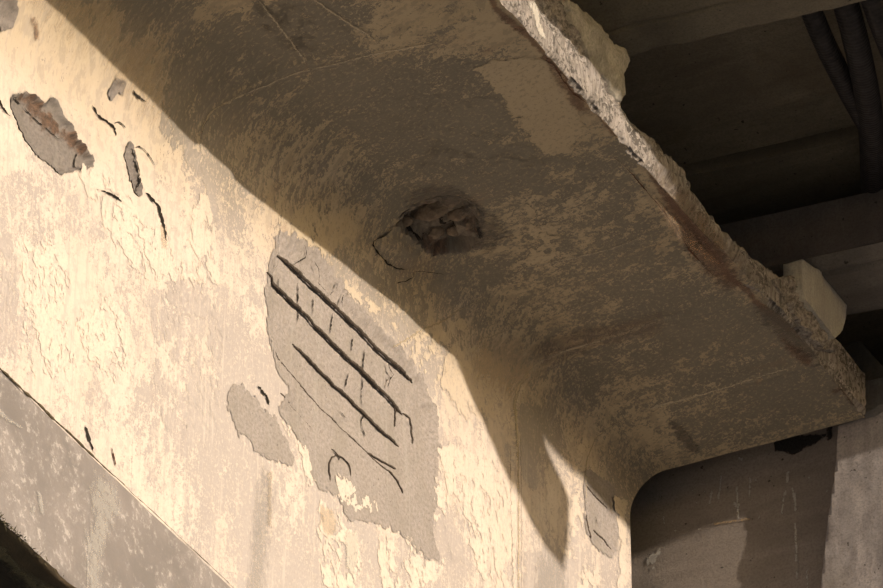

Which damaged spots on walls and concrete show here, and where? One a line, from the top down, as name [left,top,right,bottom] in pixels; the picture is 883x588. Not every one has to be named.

spalling [0,0,19,31]
peeling [472,50,590,156]
rust [490,0,621,143]
spalling [531,0,630,117]
crack [146,193,167,241]
spalling [10,91,630,588]
rust [649,173,813,364]
spalling [771,259,847,353]